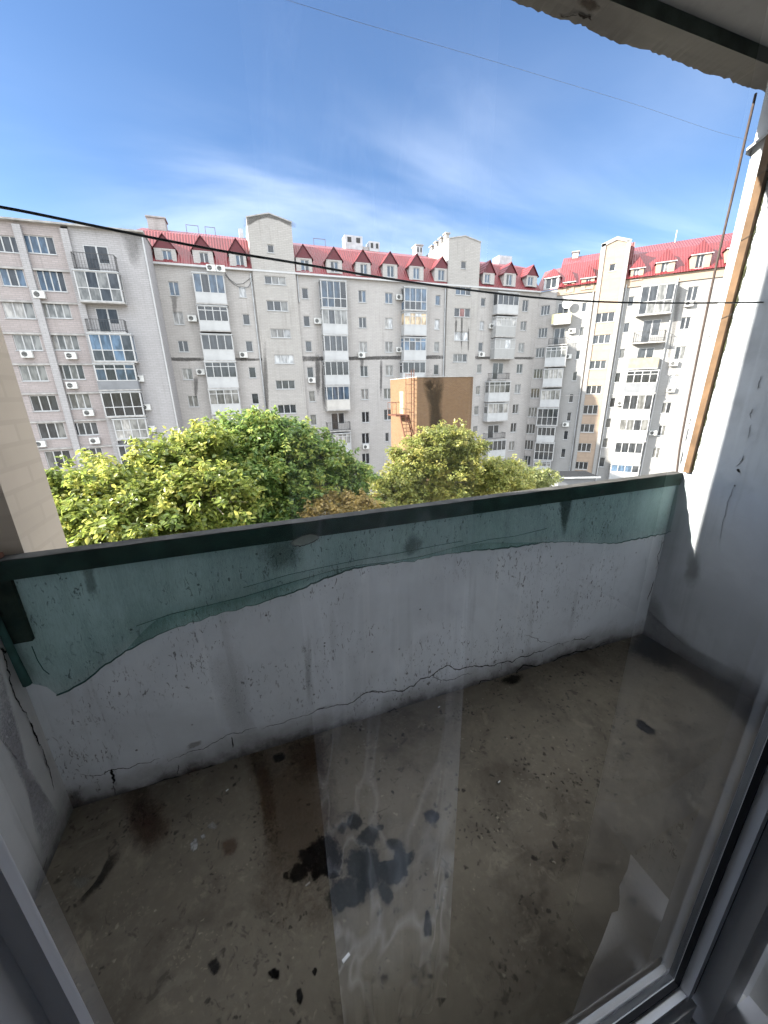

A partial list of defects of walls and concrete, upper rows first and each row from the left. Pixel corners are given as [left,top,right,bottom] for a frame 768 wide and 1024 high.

leakage [427,381,441,425]
leakage [561,500,572,528]
crack [1,648,54,787]
crack [82,635,607,794]